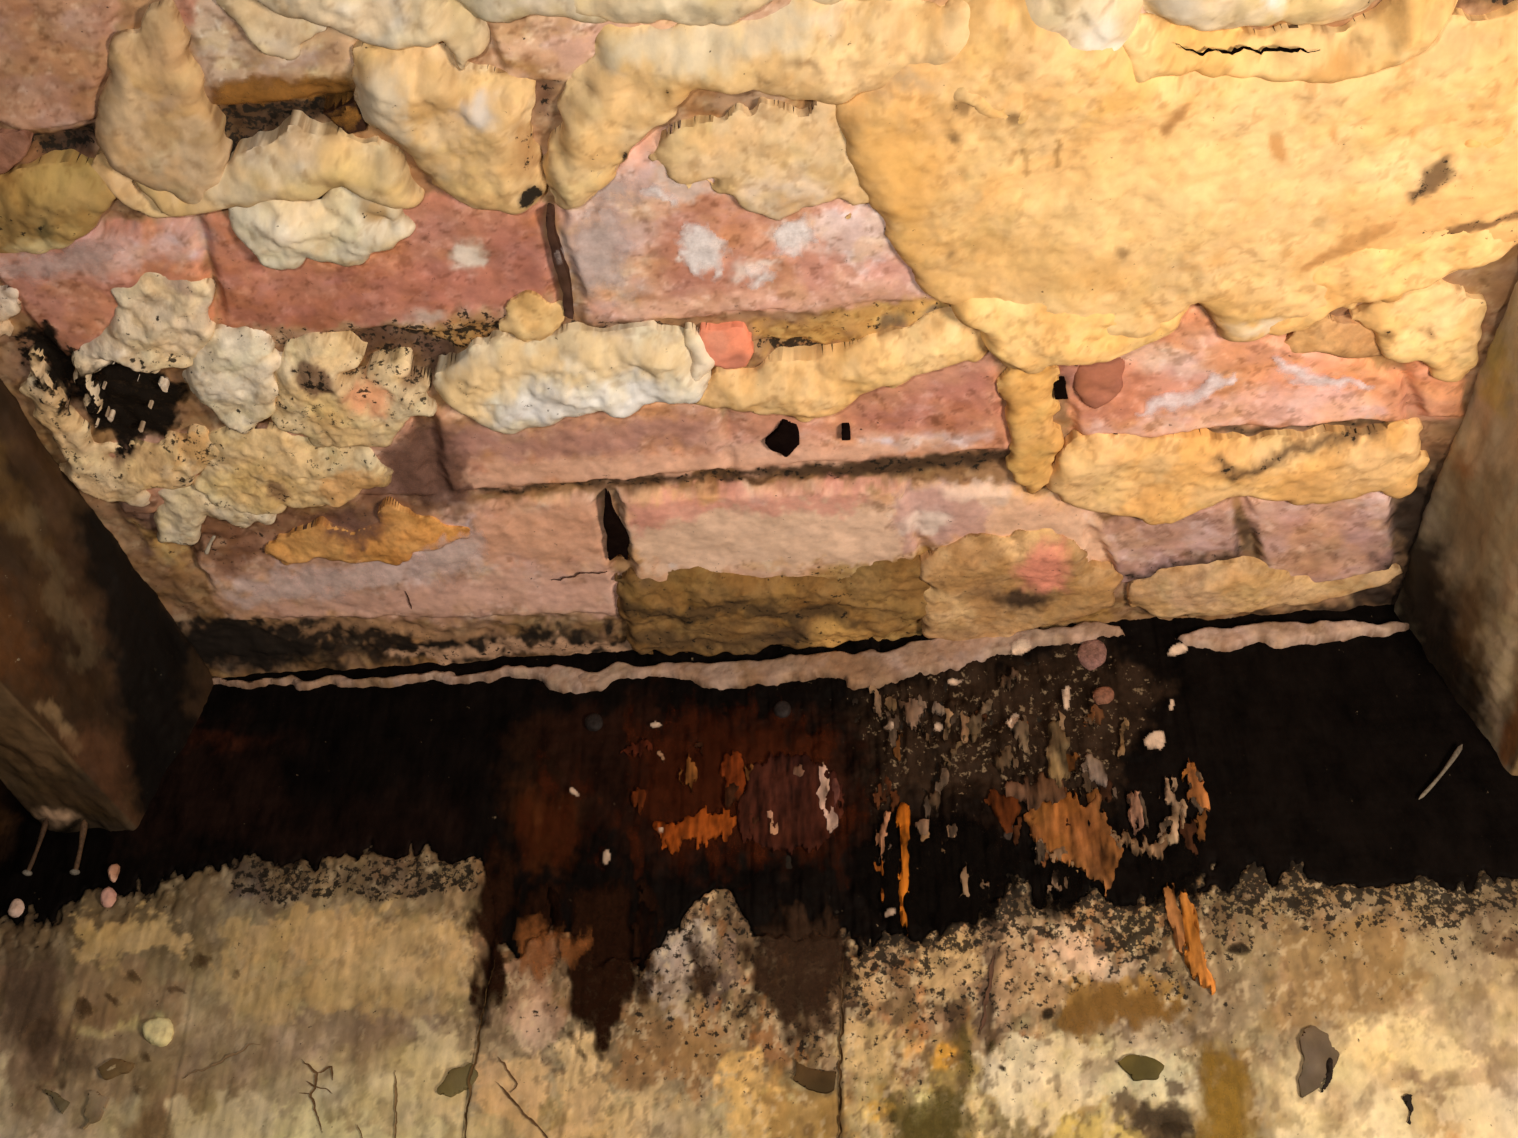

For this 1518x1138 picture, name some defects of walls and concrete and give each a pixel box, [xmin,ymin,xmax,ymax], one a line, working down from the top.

crack [1178,44,1319,56]
leakage [16,319,189,455]
leakage [643,712,832,864]
crack [465,960,548,1138]
leakage [467,811,663,1059]
leakage [689,939,720,995]
leakage [743,902,856,1044]
crack [837,947,845,1138]
leakage [852,811,1082,933]
leakage [1042,985,1178,1037]
leakage [1137,832,1202,903]
peeling [1298,1026,1340,1098]